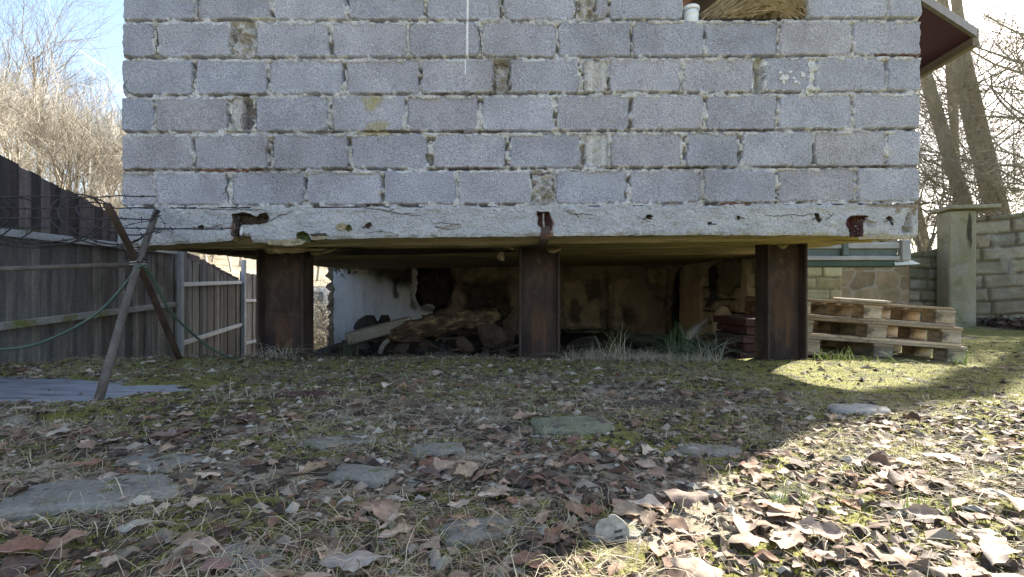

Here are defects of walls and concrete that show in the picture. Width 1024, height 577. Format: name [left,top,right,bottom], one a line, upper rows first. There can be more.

spalling [231,212,269,237]